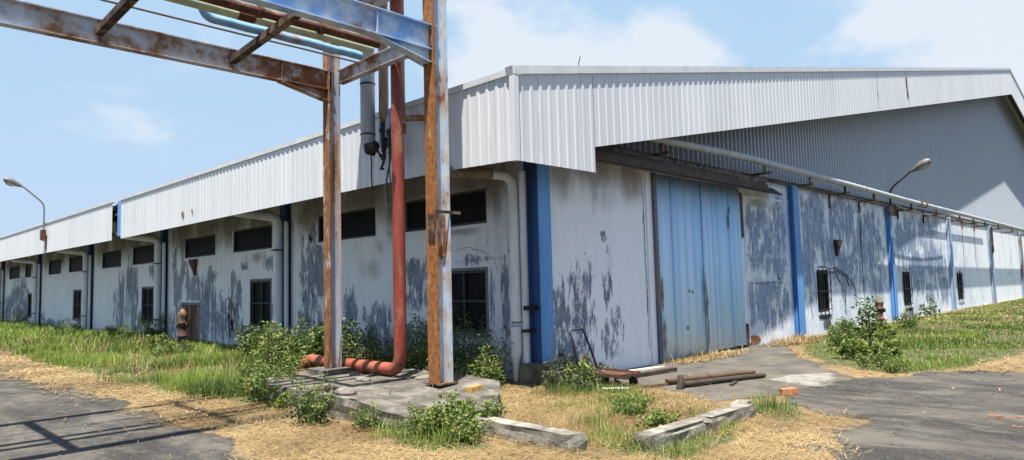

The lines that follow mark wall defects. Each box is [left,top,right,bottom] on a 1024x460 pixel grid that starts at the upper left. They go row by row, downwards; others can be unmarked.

peeling [113,250,154,334]
peeling [169,244,260,347]
peeling [298,224,324,345]
peeling [344,285,394,351]
peeling [406,256,427,311]
peeling [553,262,624,367]
peeling [745,195,791,329]
peeling [800,186,951,305]